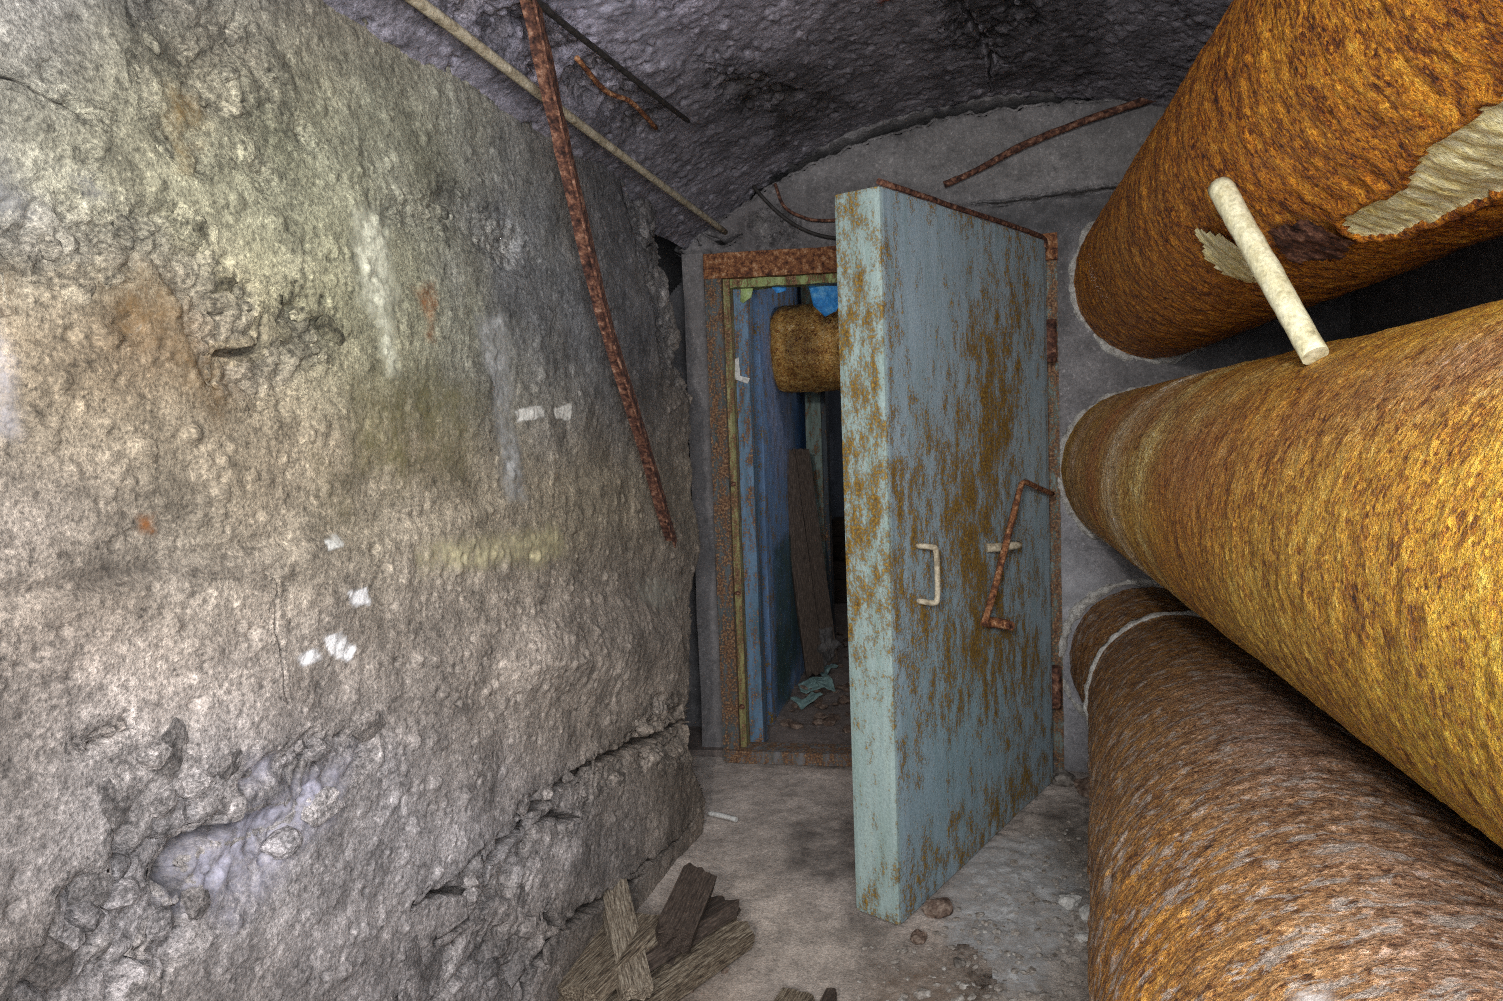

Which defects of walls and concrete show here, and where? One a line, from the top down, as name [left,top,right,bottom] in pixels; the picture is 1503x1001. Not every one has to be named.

spalling [0,42,348,416]
spalling [0,696,386,1001]
crack [412,718,684,949]